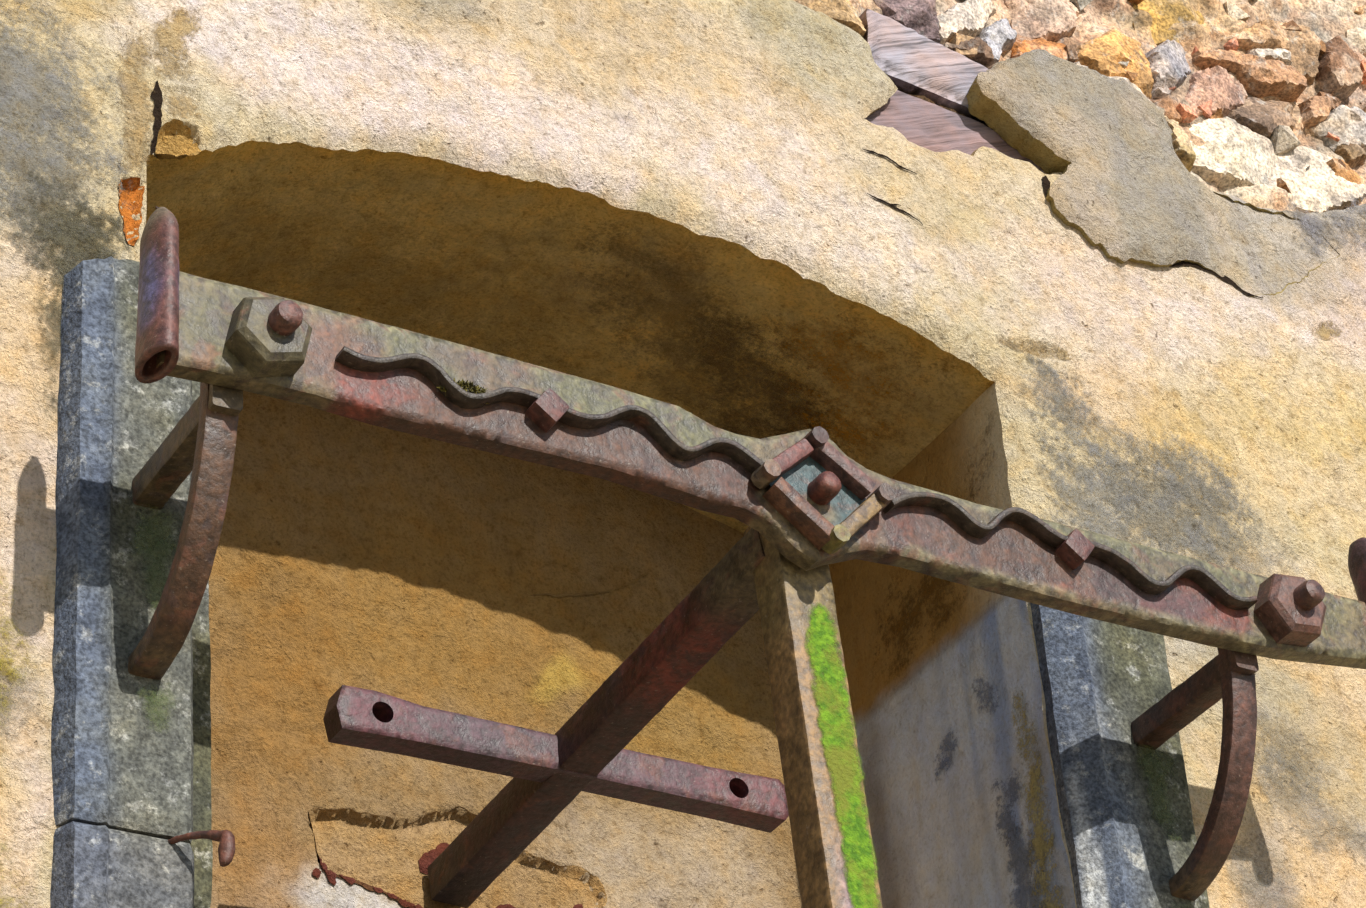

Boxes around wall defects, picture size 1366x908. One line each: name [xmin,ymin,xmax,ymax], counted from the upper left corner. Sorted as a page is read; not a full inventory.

crack [151,81,163,155]
crack [863,149,917,174]
crack [867,193,923,225]
crack [1171,261,1262,298]
water stain [782,320,914,452]
spalling [308,806,607,908]